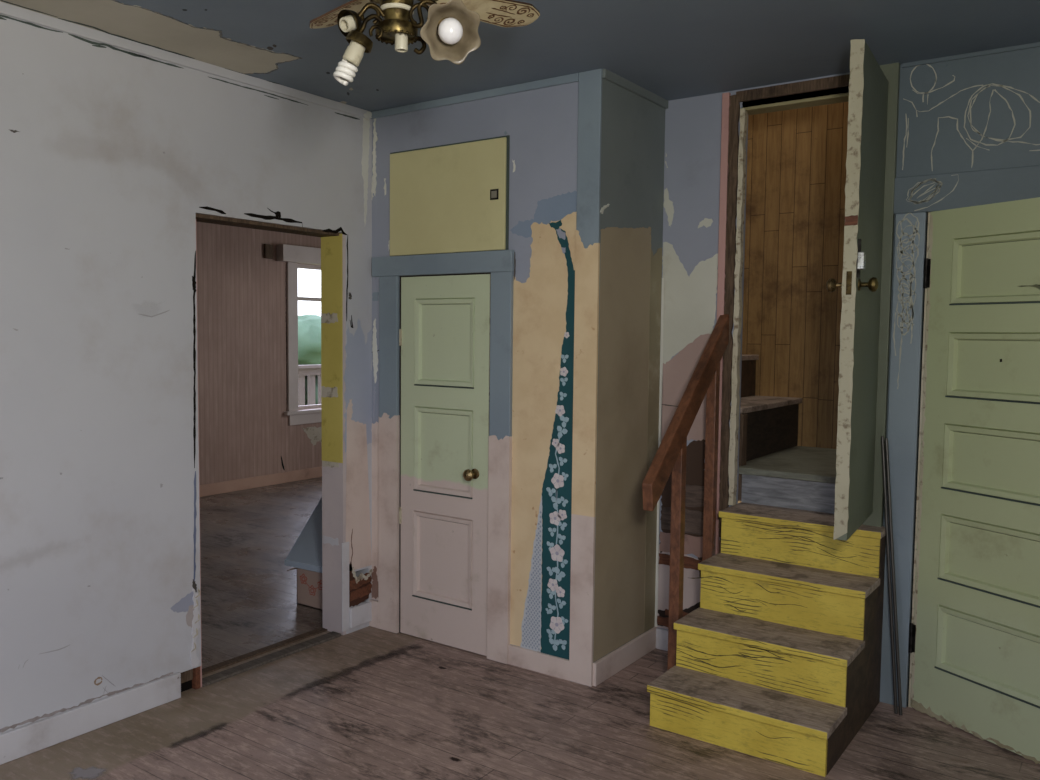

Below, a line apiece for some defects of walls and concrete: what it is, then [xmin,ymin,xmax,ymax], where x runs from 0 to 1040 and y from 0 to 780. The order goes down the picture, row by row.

peeling [1,0,302,74]
crack [199,206,353,328]
peeling [663,188,674,227]
peeling [321,386,379,607]
peeling [487,212,718,687]